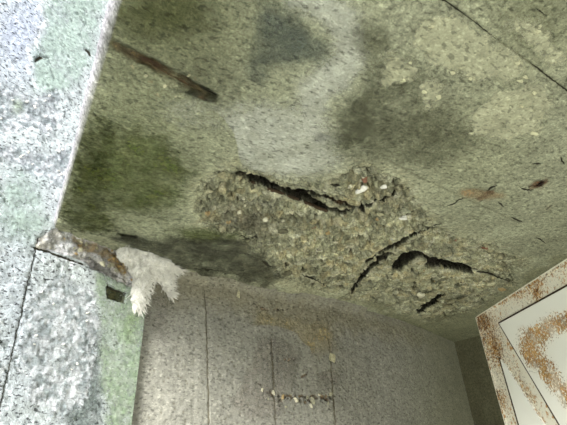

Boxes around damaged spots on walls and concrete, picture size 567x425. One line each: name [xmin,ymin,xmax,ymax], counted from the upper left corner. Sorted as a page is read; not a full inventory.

leakage [261,10,324,61]
leakage [342,80,449,160]
crack [236,170,396,215]
leakage [112,237,281,288]
spalling [195,167,521,322]
crack [351,223,443,294]
corrosion [498,260,567,309]
corrosion [477,310,567,422]